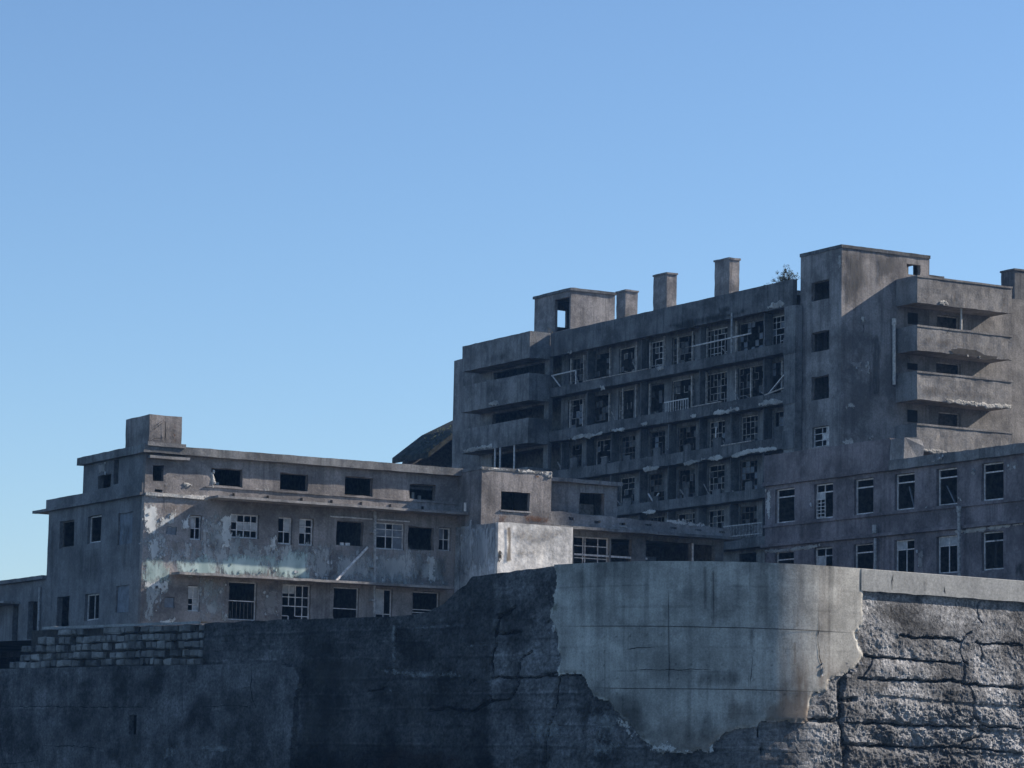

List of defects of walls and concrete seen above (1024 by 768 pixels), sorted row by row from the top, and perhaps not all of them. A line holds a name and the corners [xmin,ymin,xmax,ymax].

spalling [946,398,1011,409]
peeling [142,470,503,623]
crack [430,608,582,764]
crack [808,611,1021,768]